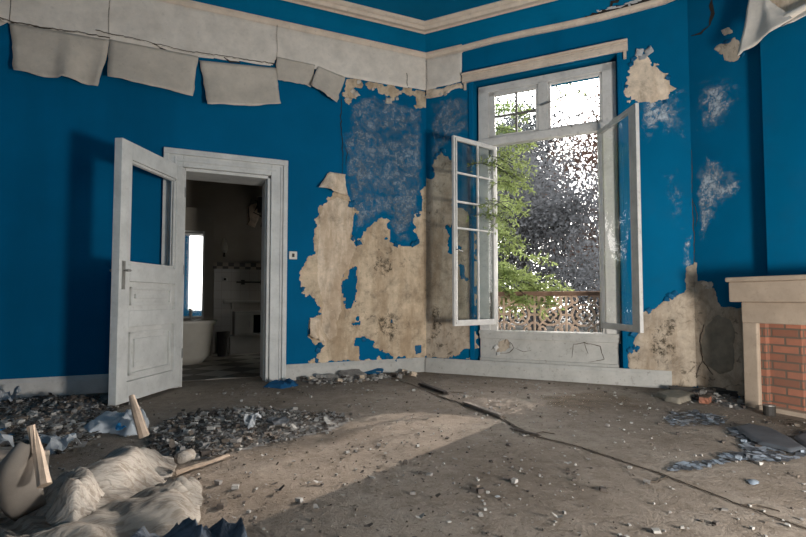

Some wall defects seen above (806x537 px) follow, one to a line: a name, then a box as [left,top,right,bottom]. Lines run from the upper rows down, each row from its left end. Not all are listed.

spalling [714,27,745,62]
flaking render [770,0,806,12]
spalling [624,45,676,125]
flaking render [299,78,479,363]
flaking render [627,262,745,396]
crack [388,377,466,406]
crack [500,418,806,529]